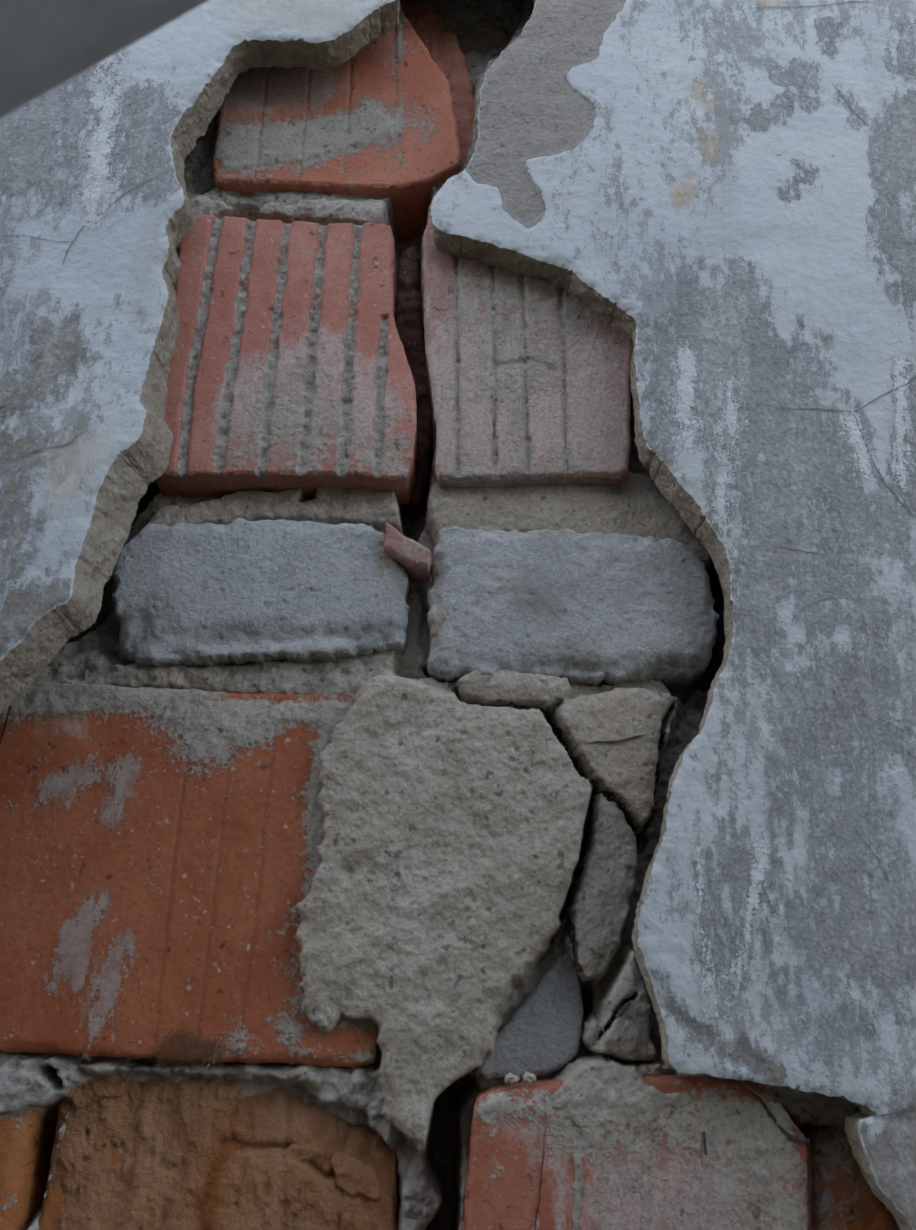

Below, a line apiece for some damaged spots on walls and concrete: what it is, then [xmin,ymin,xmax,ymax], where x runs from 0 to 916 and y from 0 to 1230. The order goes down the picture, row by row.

peeling [728,14,916,319]
flaking render [0,0,400,713]
crack [777,376,916,518]
peeling [431,216,916,1230]
spalling [49,1077,393,1230]
crack [534,1113,547,1230]